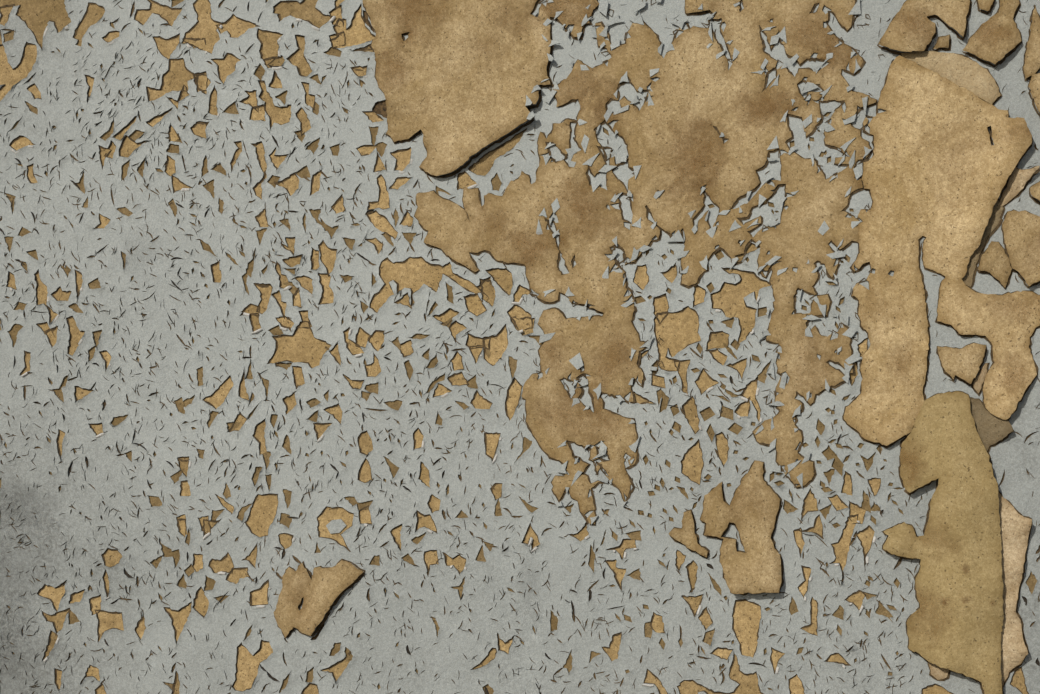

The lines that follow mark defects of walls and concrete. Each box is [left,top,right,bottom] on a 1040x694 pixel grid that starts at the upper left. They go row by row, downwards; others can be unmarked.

peeling [0,0,120,127]
peeling [74,172,133,229]
peeling [99,113,147,180]
peeling [202,141,245,214]
peeling [7,250,115,370]
peeling [0,318,31,377]
peeling [273,0,1040,694]
peeling [51,375,128,438]
peeling [164,209,403,644]
peeling [150,544,180,568]
peeling [37,548,146,694]
peeling [228,626,273,694]